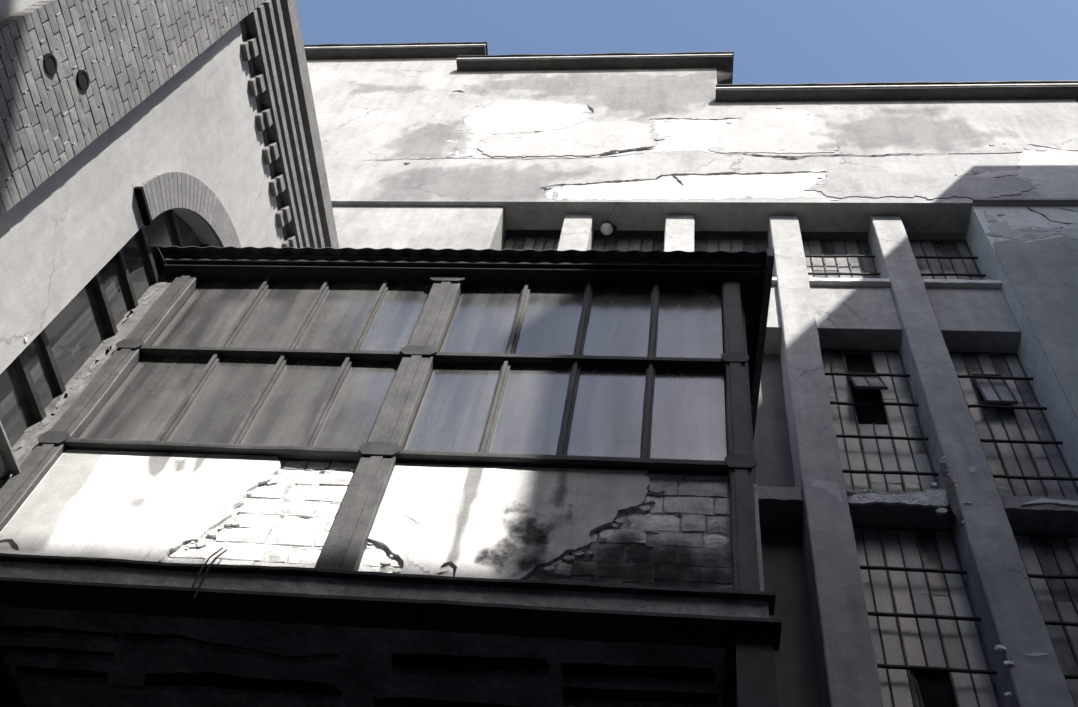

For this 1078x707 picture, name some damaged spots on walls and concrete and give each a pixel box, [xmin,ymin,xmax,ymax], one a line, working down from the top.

peeling [444,100,592,158]
peeling [650,118,738,154]
peeling [544,169,838,201]
peeling [965,146,1078,198]
flaking render [163,460,358,568]
flaking render [358,540,404,573]
mould [476,519,733,588]
flaking render [525,473,733,590]